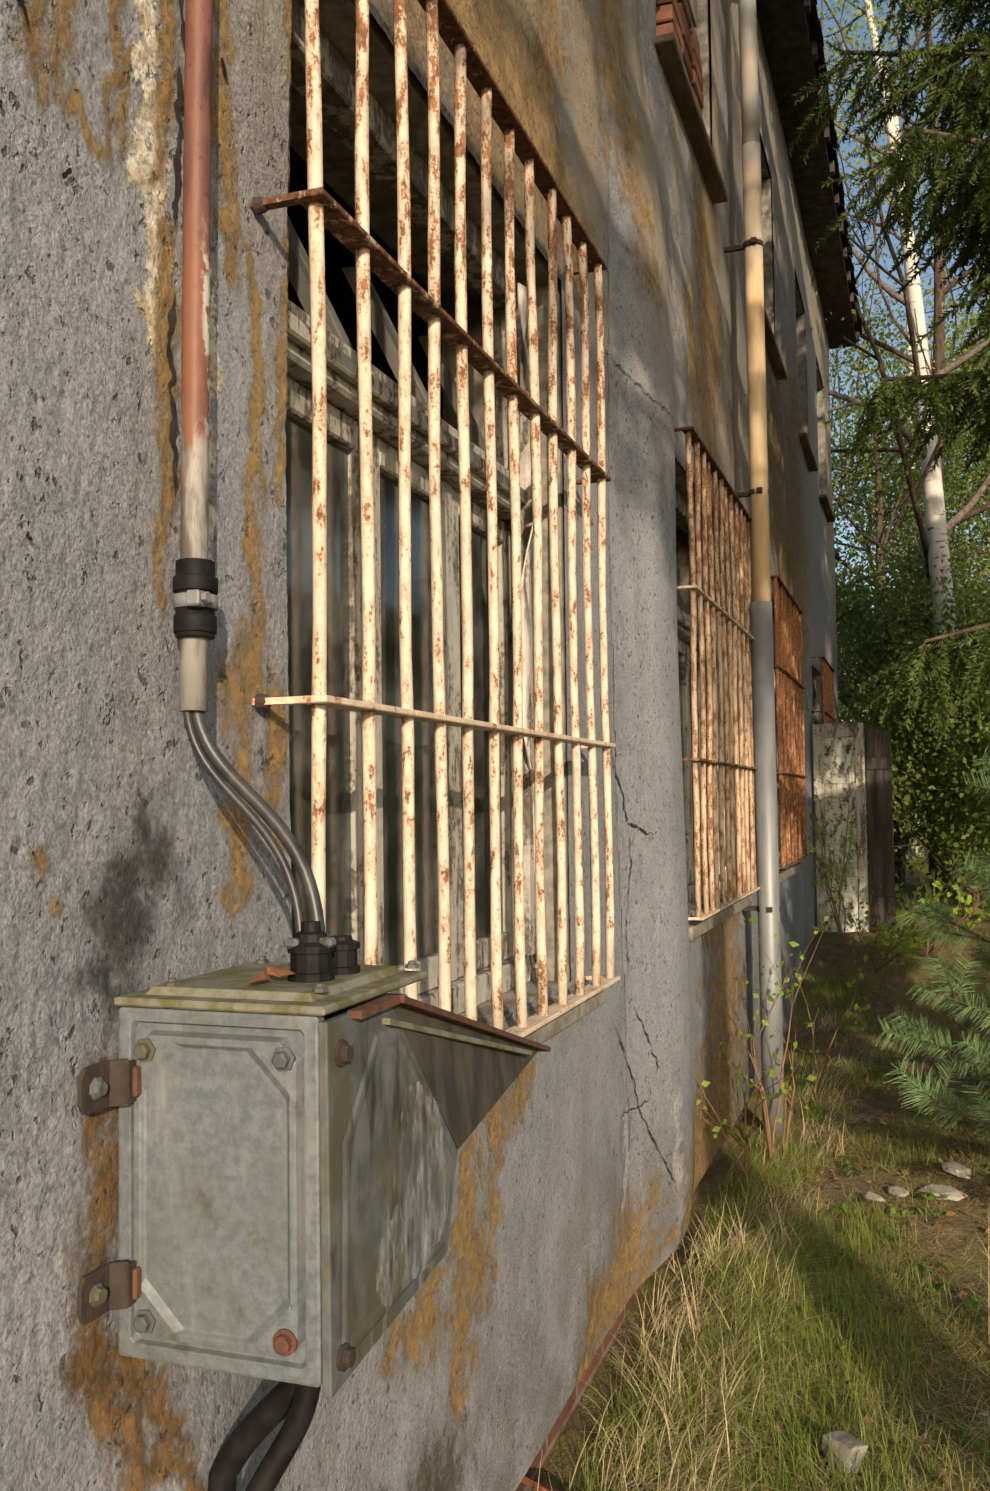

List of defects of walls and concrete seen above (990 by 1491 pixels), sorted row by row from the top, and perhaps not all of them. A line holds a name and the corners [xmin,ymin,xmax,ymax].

damp [16,0,135,158]
damp [148,0,176,186]
damp [284,0,292,79]
damp [385,0,590,295]
damp [639,0,687,360]
damp [151,220,180,612]
damp [211,0,290,916]
corrosion [76,1106,118,1277]
corrosion [440,1059,535,1436]
crack [616,1006,679,1196]
corrosion [60,1312,207,1491]
damp [418,1434,461,1491]